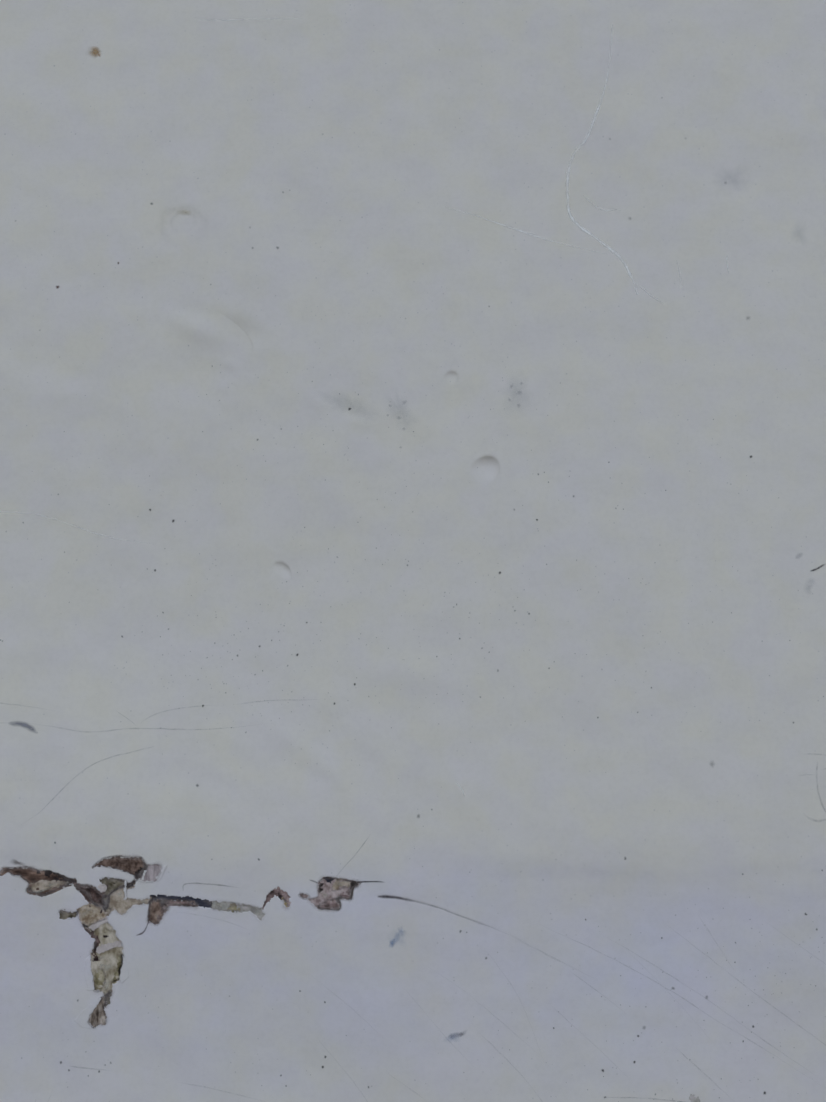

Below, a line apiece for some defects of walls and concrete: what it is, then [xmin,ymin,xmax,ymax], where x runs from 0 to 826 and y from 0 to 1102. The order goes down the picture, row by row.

peeling [0,855,359,1029]